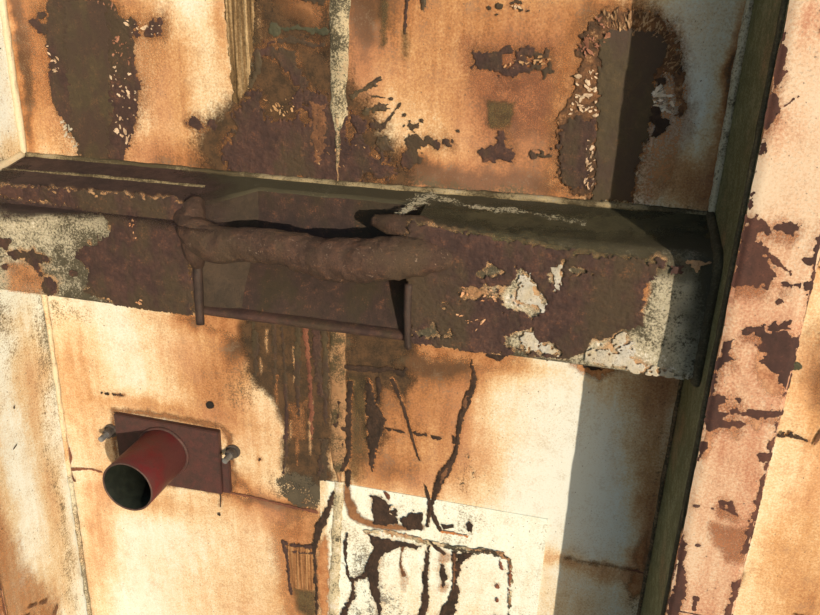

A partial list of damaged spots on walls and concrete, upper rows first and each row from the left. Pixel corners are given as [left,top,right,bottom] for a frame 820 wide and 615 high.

peeling [551,3,687,203]
rust [0,0,460,488]
peeling [510,273,547,313]
peeling [551,262,565,291]
peeling [653,257,712,275]
rust [345,220,658,476]
peeling [520,329,559,357]
peeling [585,332,690,380]
rust [344,483,424,531]